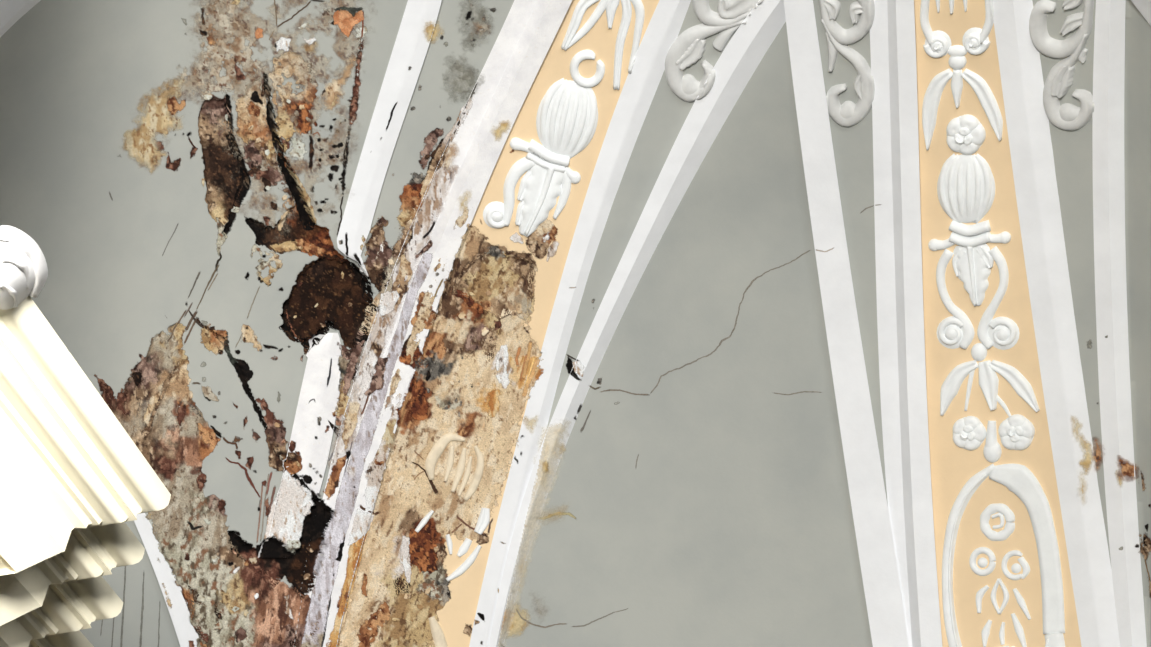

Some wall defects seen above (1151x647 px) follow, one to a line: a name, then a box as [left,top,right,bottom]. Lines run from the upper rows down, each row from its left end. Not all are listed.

spalling [322,6,367,41]
crack [250,12,364,235]
crack [380,102,397,139]
spalling [94,22,544,647]
crack [601,248,833,405]
rust [1118,457,1146,491]
rust [1135,524,1151,598]